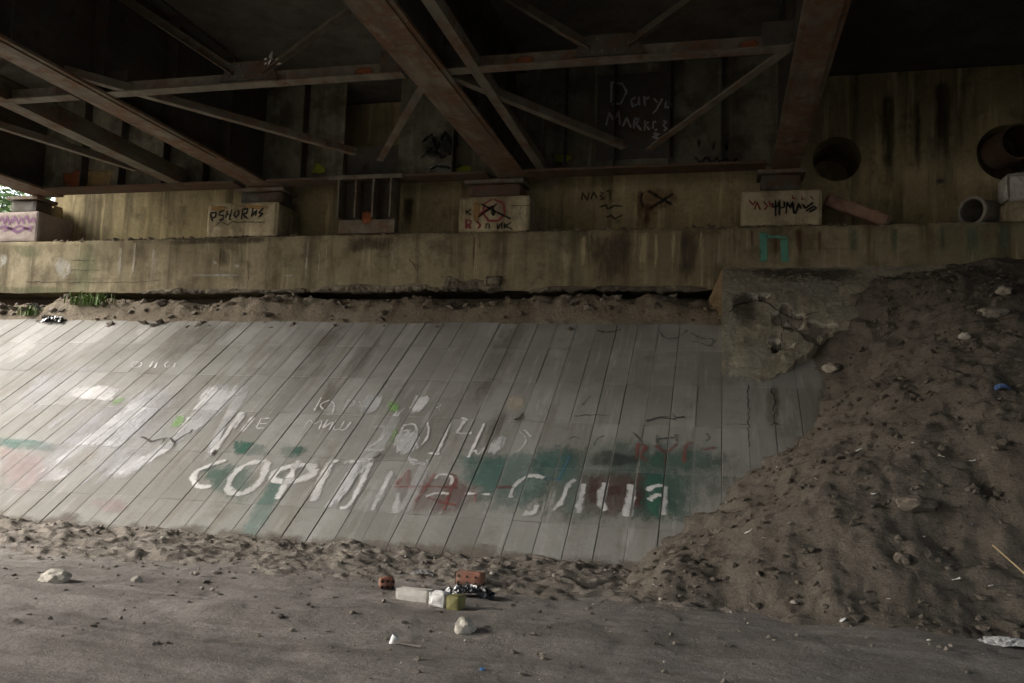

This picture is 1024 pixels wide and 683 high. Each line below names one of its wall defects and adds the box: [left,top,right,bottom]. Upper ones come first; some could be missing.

crack [728,300,816,350]
spalling [746,292,839,353]
crack [727,385,784,447]